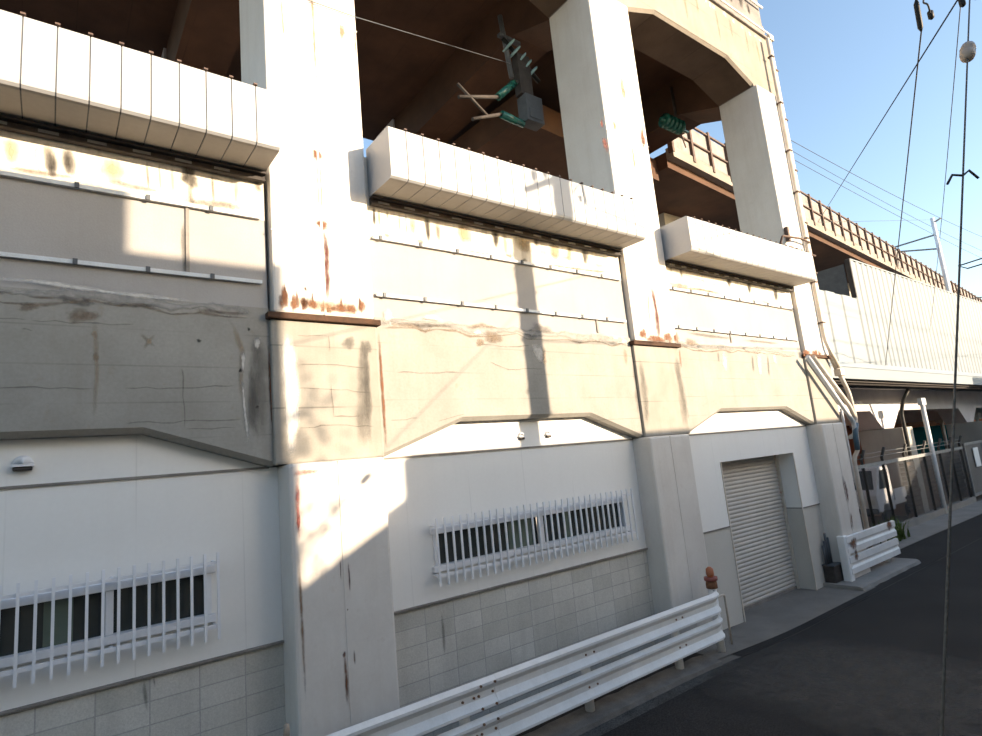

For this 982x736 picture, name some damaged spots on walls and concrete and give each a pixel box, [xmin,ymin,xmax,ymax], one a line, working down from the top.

corrosion [280,221,366,313]
corrosion [640,291,678,343]
damp [360,345,370,423]